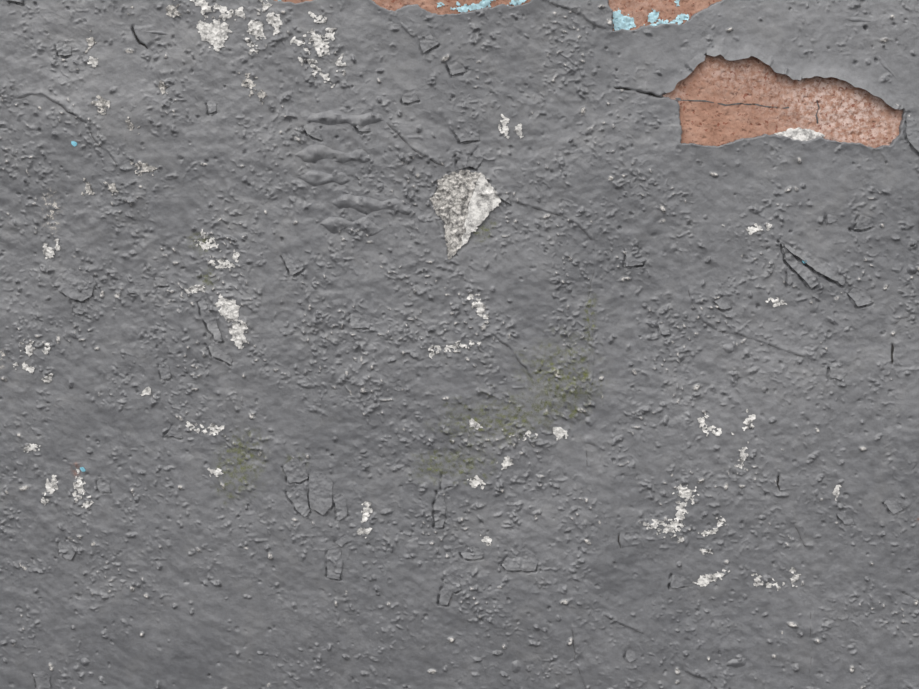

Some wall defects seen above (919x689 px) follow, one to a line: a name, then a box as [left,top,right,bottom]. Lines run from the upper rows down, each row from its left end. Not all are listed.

peeling [372,0,530,15]
peeling [609,0,721,31]
peeling [661,44,919,152]
flaking render [427,130,510,262]